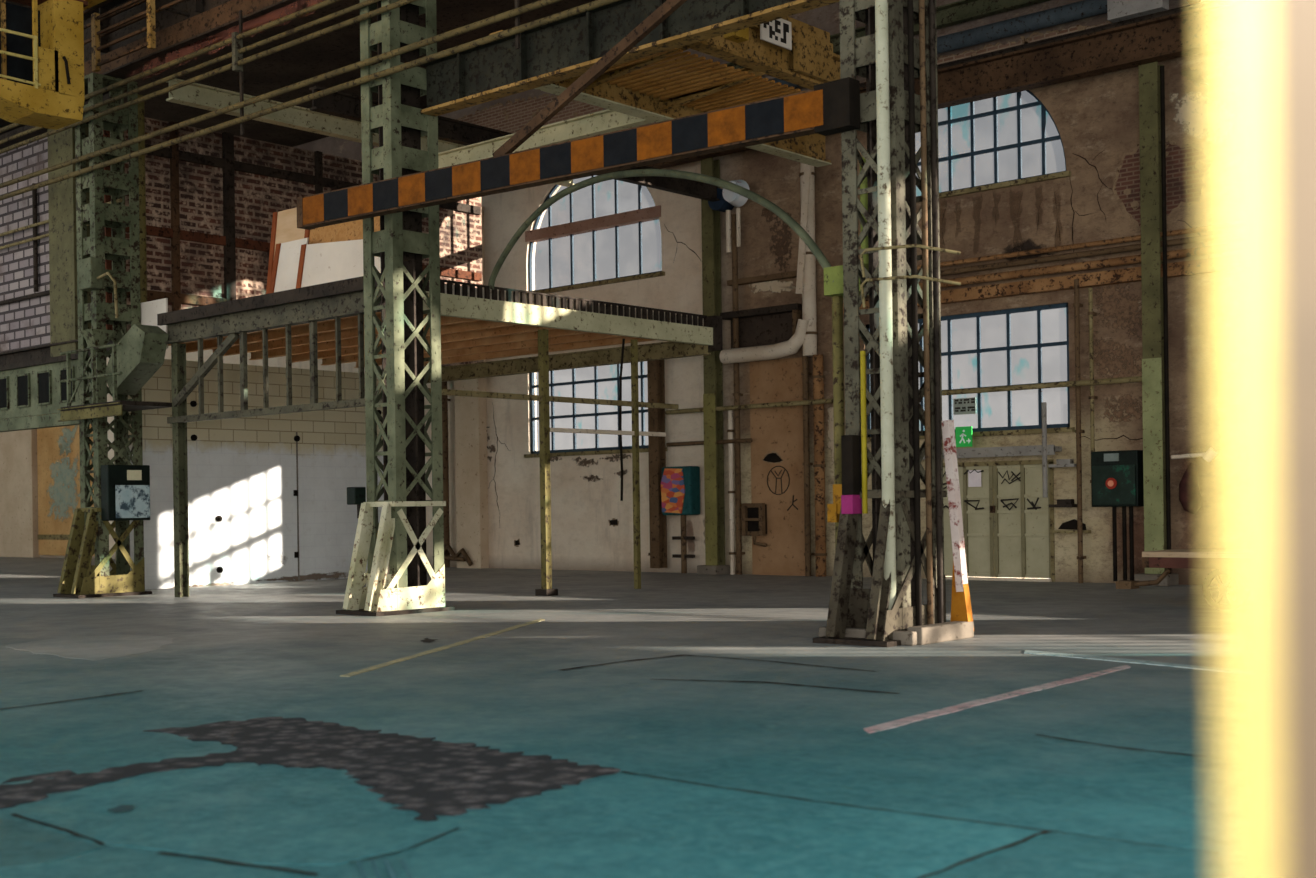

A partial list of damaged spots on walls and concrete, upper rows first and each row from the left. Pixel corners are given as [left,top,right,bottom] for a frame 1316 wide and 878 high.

spalling [1113,144,1141,229]
spalling [1165,137,1216,218]
damp [1004,239,1053,261]